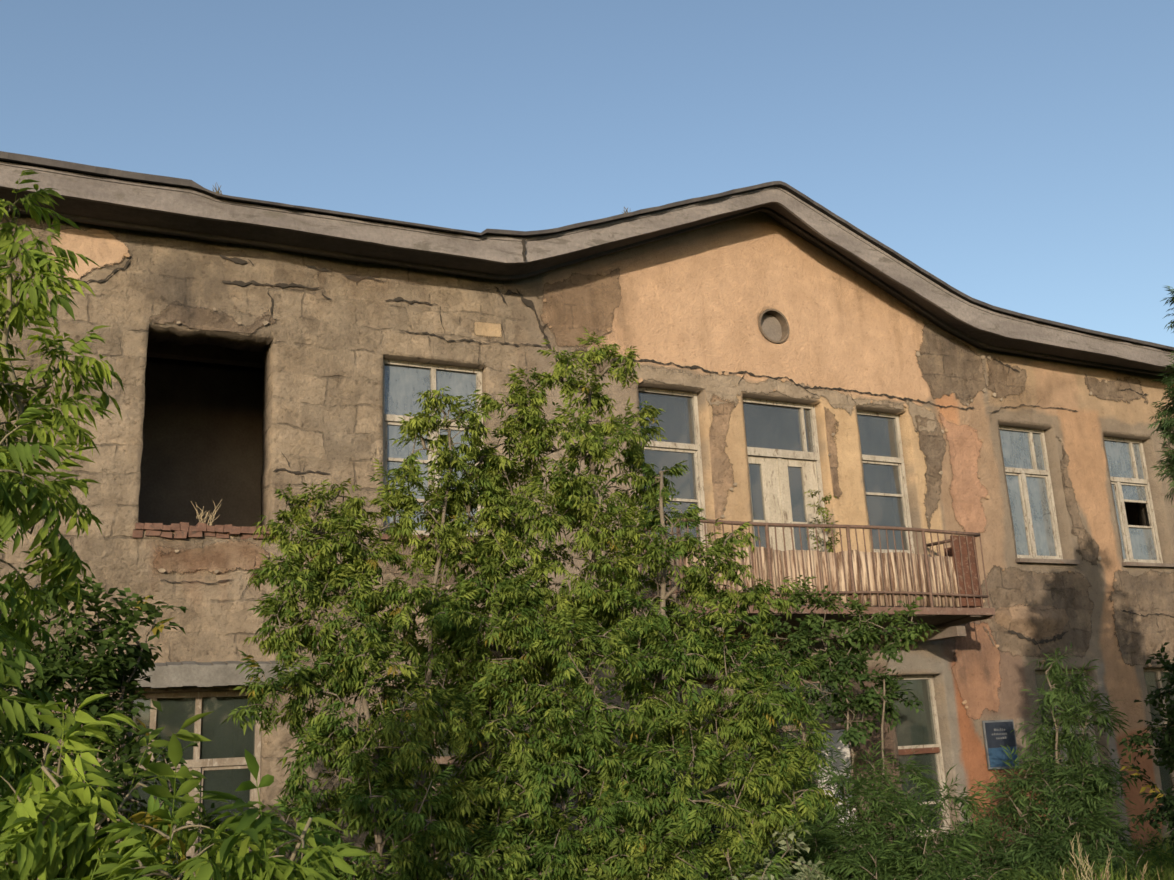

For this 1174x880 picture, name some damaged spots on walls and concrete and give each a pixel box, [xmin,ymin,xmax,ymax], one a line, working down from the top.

peeling [51,228,130,280]
crack [519,238,527,261]
spalling [149,301,276,333]
crack [220,255,551,349]
spalling [474,321,502,338]
peeling [540,268,622,374]
spalling [1085,374,1148,404]
spalling [624,324,1027,539]
spalling [153,539,269,574]
spalling [387,541,485,590]
spalling [952,436,1102,720]
spalling [1108,569,1174,667]